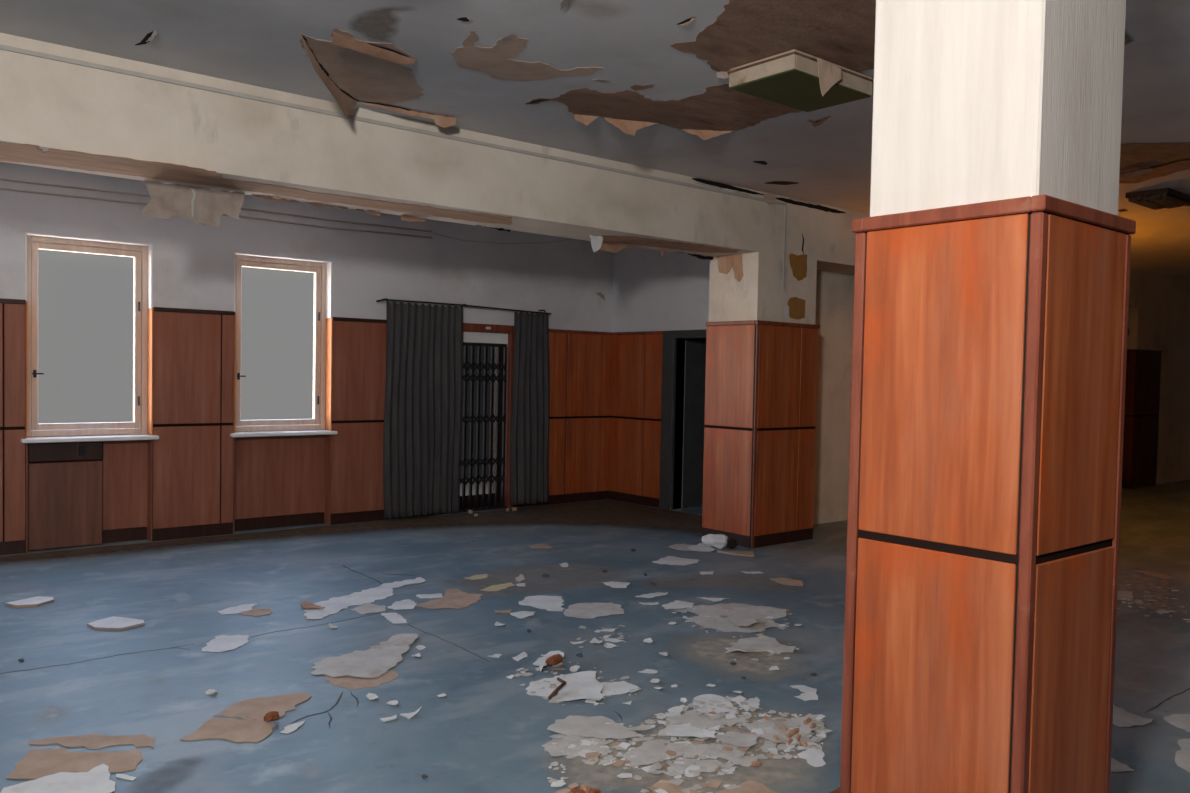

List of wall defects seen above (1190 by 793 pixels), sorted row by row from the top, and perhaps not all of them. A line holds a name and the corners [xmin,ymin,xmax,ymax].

damp [354,9,395,40]
peeling [451,0,876,140]
peeling [1119,142,1190,183]
peeling [789,253,807,281]
peeling [785,297,805,319]